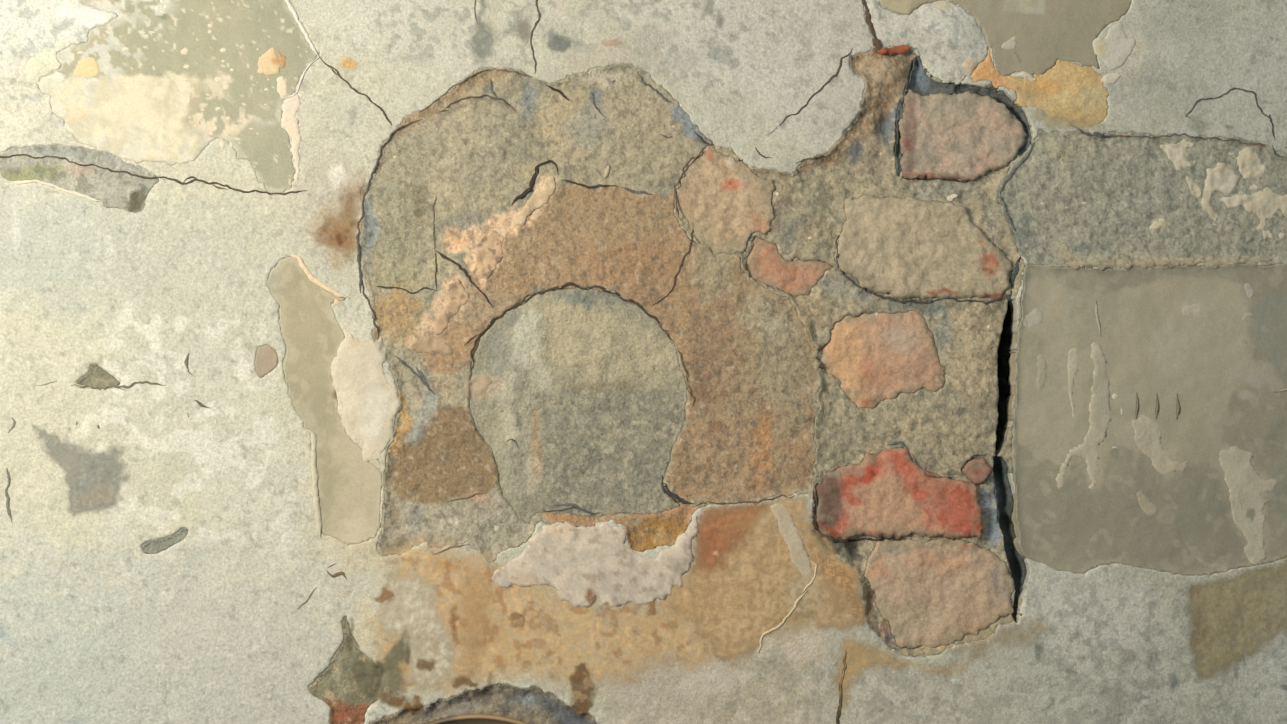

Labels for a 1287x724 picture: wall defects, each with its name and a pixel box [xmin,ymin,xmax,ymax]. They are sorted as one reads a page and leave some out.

crack [0,154,307,195]
peeling [0,0,320,213]
crack [756,0,883,163]
peeling [879,0,1136,89]
crack [1071,88,1287,157]
peeling [1160,139,1287,239]
spalling [255,45,1043,657]
crack [835,56,1034,622]
peeling [1056,342,1189,490]
peeling [1189,446,1287,678]
spalling [308,616,385,724]
crack [836,652,847,724]